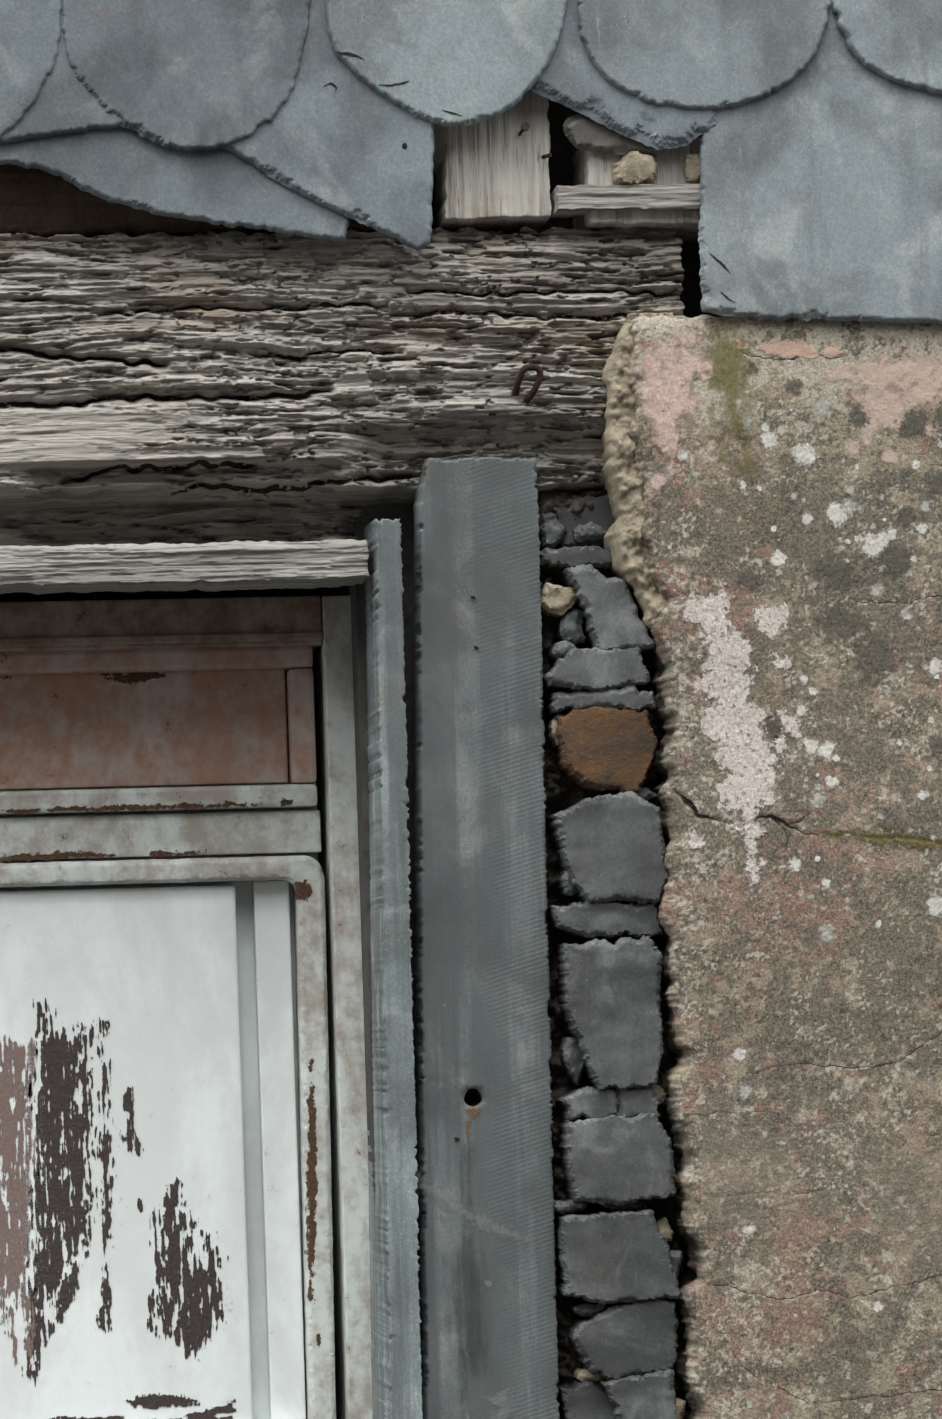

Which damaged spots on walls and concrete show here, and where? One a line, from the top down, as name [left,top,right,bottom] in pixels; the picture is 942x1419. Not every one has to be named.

crack [675,791,853,852]
peeling [0,998,144,1386]
peeling [137,1177,229,1360]
corrosion [304,1058,318,1304]
peeling [52,1393,236,1419]